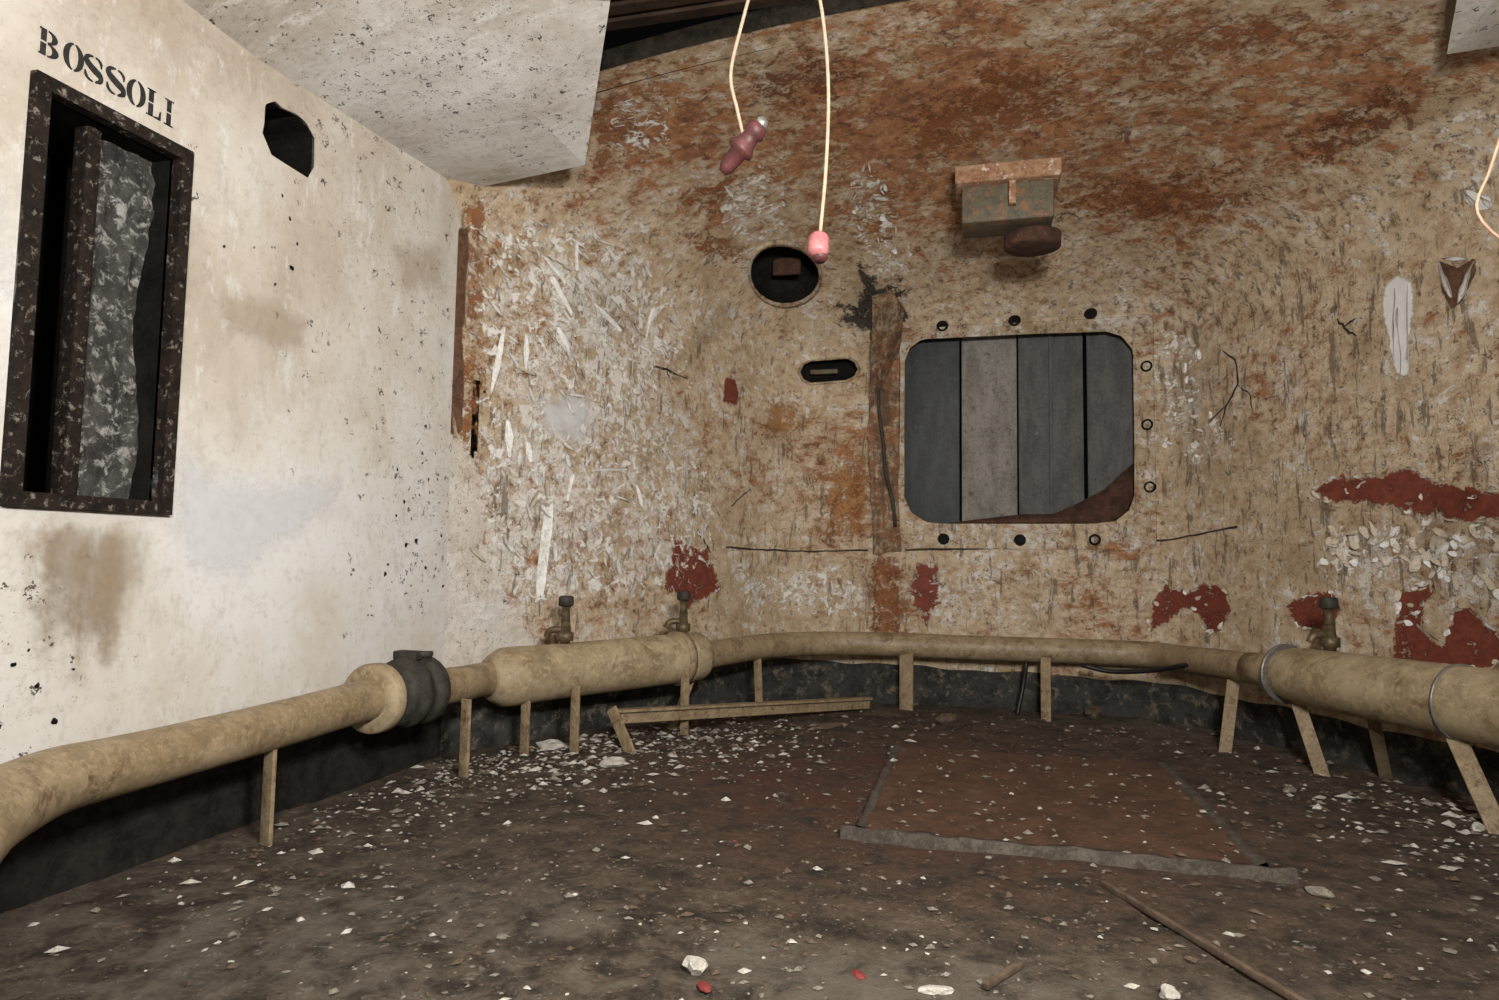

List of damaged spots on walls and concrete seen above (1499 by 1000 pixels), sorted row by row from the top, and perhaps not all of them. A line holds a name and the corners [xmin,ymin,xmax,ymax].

rust [591,97,617,188]
rust [735,37,872,119]
rust [896,58,1071,170]
rust [1087,0,1324,103]
rust [1055,160,1269,230]
peeling [1383,276,1414,378]
peeling [1438,257,1476,309]
peeling [450,221,721,612]
peeling [722,377,740,406]
peeling [908,562,942,626]
peeling [1147,579,1231,636]
peeling [1286,466,1499,668]